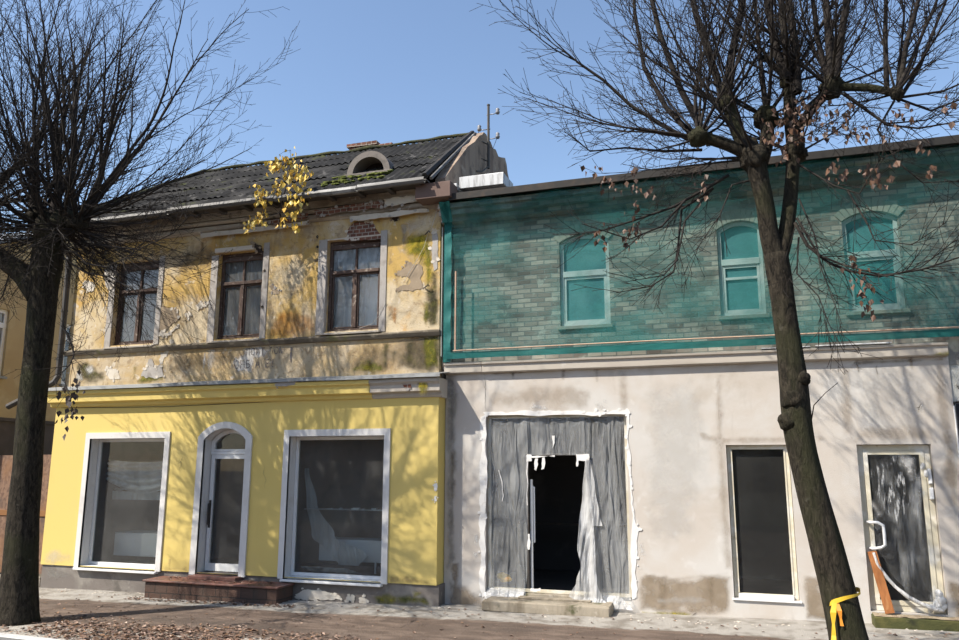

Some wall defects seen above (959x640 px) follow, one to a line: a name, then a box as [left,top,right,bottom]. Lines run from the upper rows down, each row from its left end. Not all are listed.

flaking render [344,195,429,241]
peeling [394,231,440,292]
leakage [424,275,437,324]
flaking render [141,300,209,379]
leakage [401,336,437,368]
flaking render [295,588,369,603]